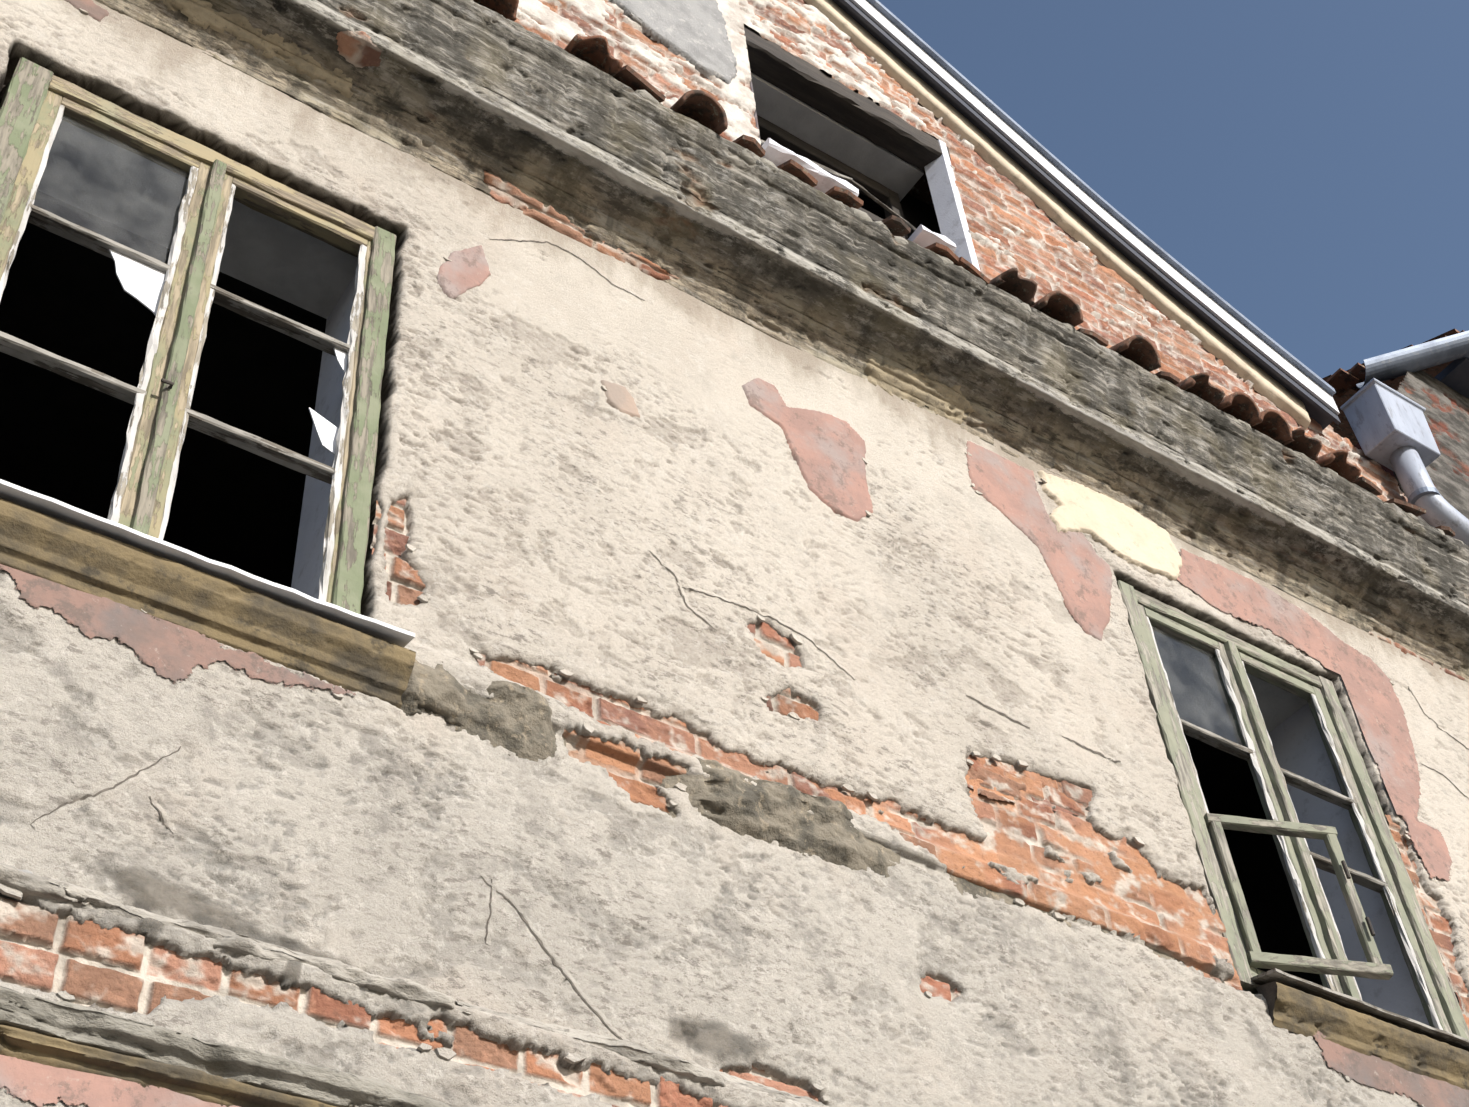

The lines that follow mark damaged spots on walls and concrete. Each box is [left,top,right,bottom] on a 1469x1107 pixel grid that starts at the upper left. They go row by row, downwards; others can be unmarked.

peeling [436,245,491,299]
crack [488,236,645,301]
peeling [742,378,873,522]
peeling [965,441,1113,641]
peeling [0,564,361,699]
flaking render [747,615,803,668]
crack [31,746,185,834]
flaking render [469,648,1242,991]
peeling [1176,549,1469,1029]
flaking render [0,883,728,1107]
crack [480,873,629,1041]
flaking render [920,976,961,1001]